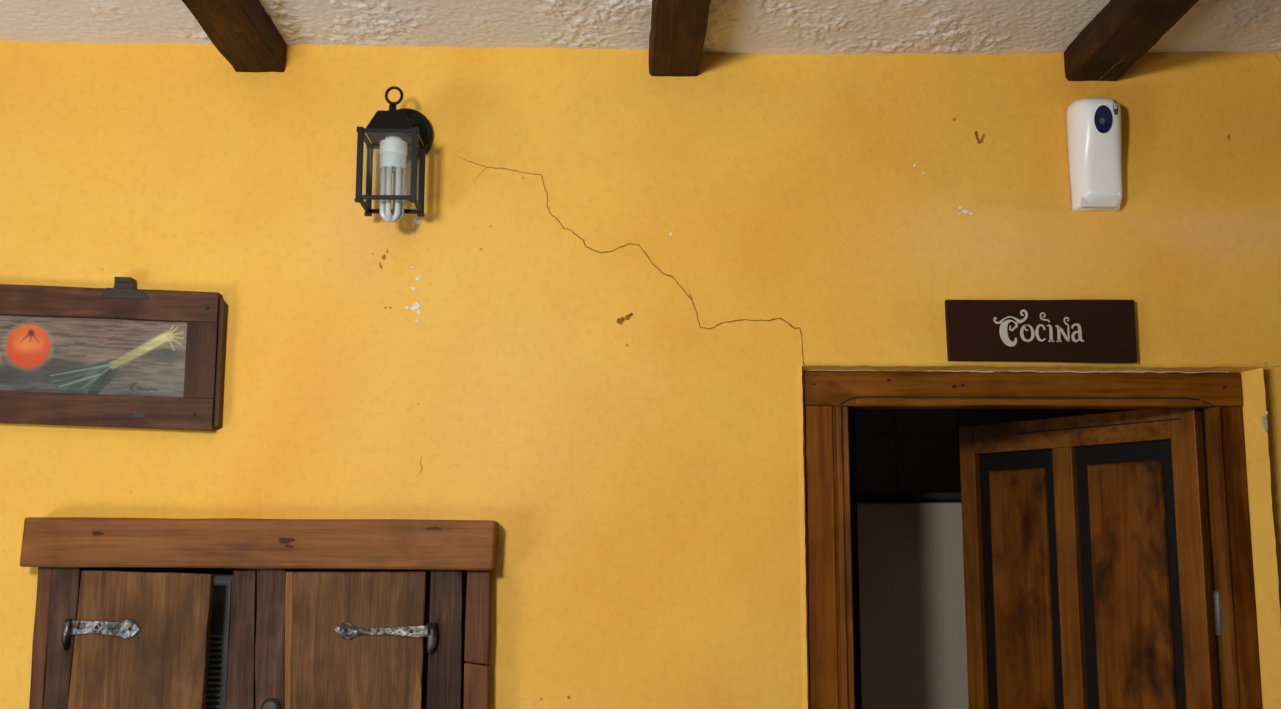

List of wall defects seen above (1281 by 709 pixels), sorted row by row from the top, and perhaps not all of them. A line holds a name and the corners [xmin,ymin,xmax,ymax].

peeling [405,265,421,322]
crack [454,155,805,365]